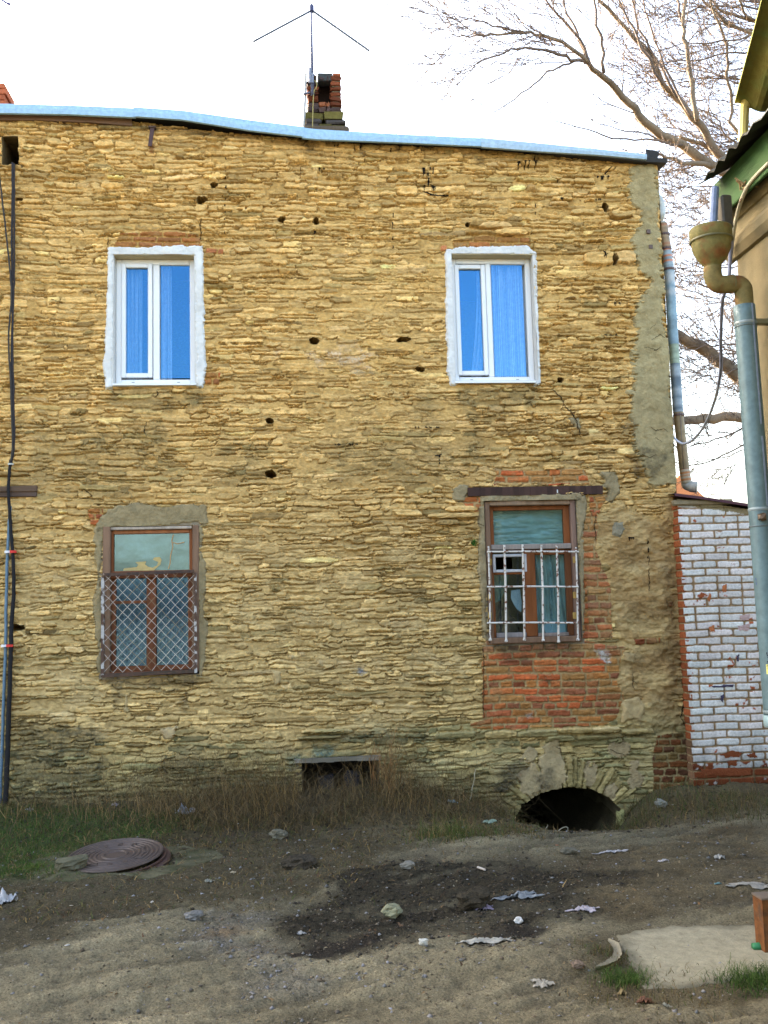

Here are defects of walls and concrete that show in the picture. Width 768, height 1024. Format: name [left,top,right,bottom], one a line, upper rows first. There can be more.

crack [553,390,581,437]
flaking render [620,696,645,723]
flaking render [516,739,569,798]
flaking render [583,739,645,801]
peeling [701,750,757,776]